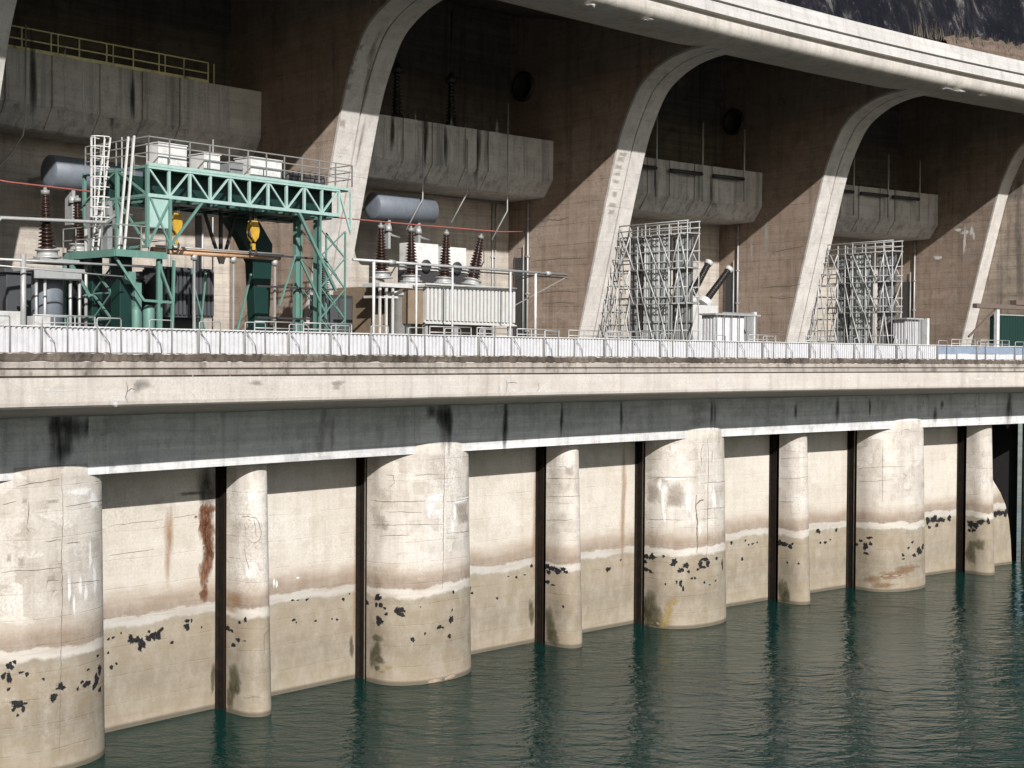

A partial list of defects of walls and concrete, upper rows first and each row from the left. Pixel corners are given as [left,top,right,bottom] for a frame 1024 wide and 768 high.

water stain [430,409,451,436]
crack [657,444,724,558]
peeling [926,515,951,529]
rust [195,506,215,602]
peeling [546,564,568,586]
peeling [644,552,723,591]
peeling [366,593,406,626]
water stain [644,595,676,627]
peeling [50,627,174,703]
water stain [370,635,390,672]
peeling [1,660,29,717]